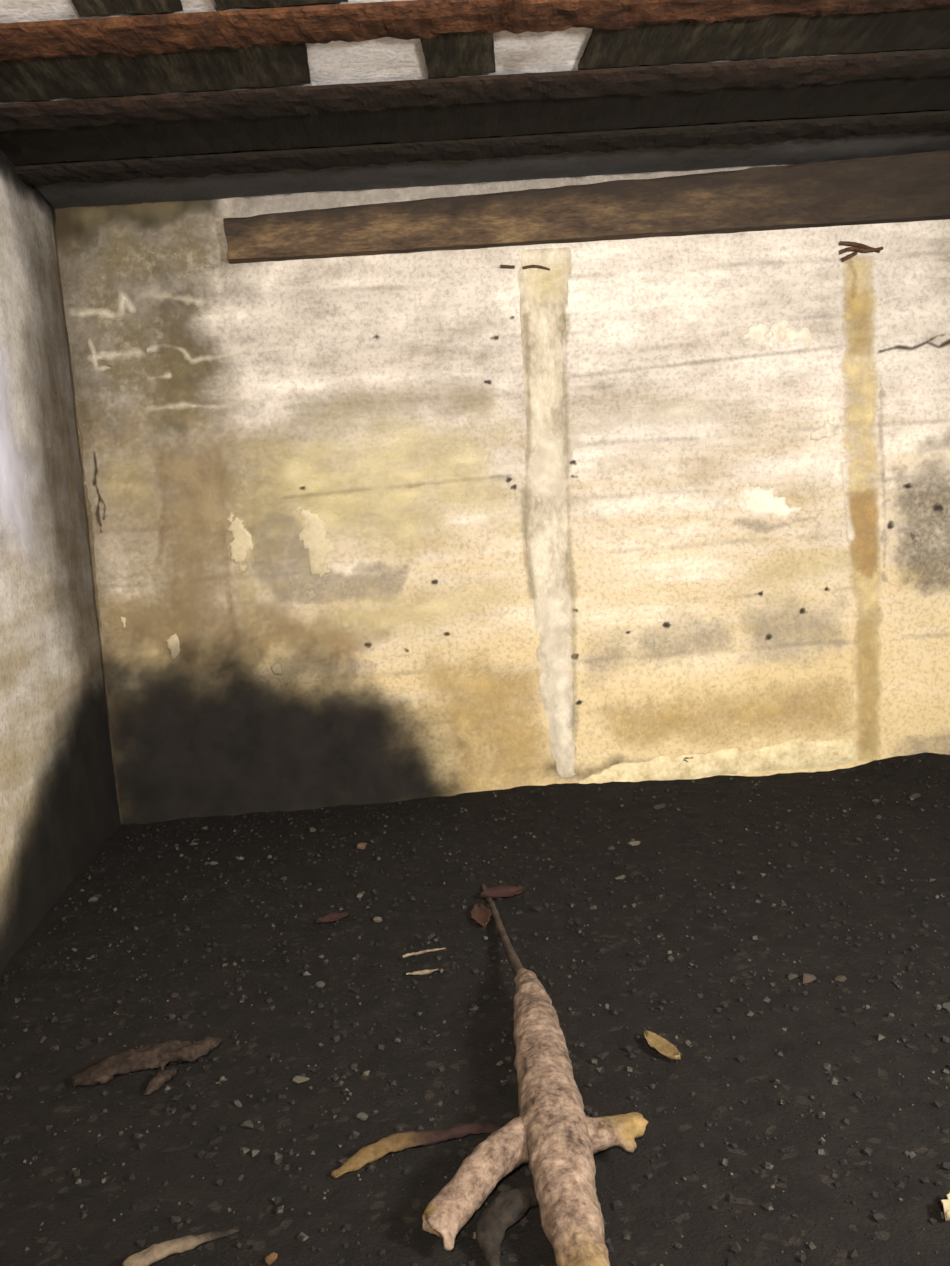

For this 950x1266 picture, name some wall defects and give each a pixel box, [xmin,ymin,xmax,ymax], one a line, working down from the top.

crack [879,337,950,352]
peeling [226,505,400,600]
corrosion [842,259,884,761]